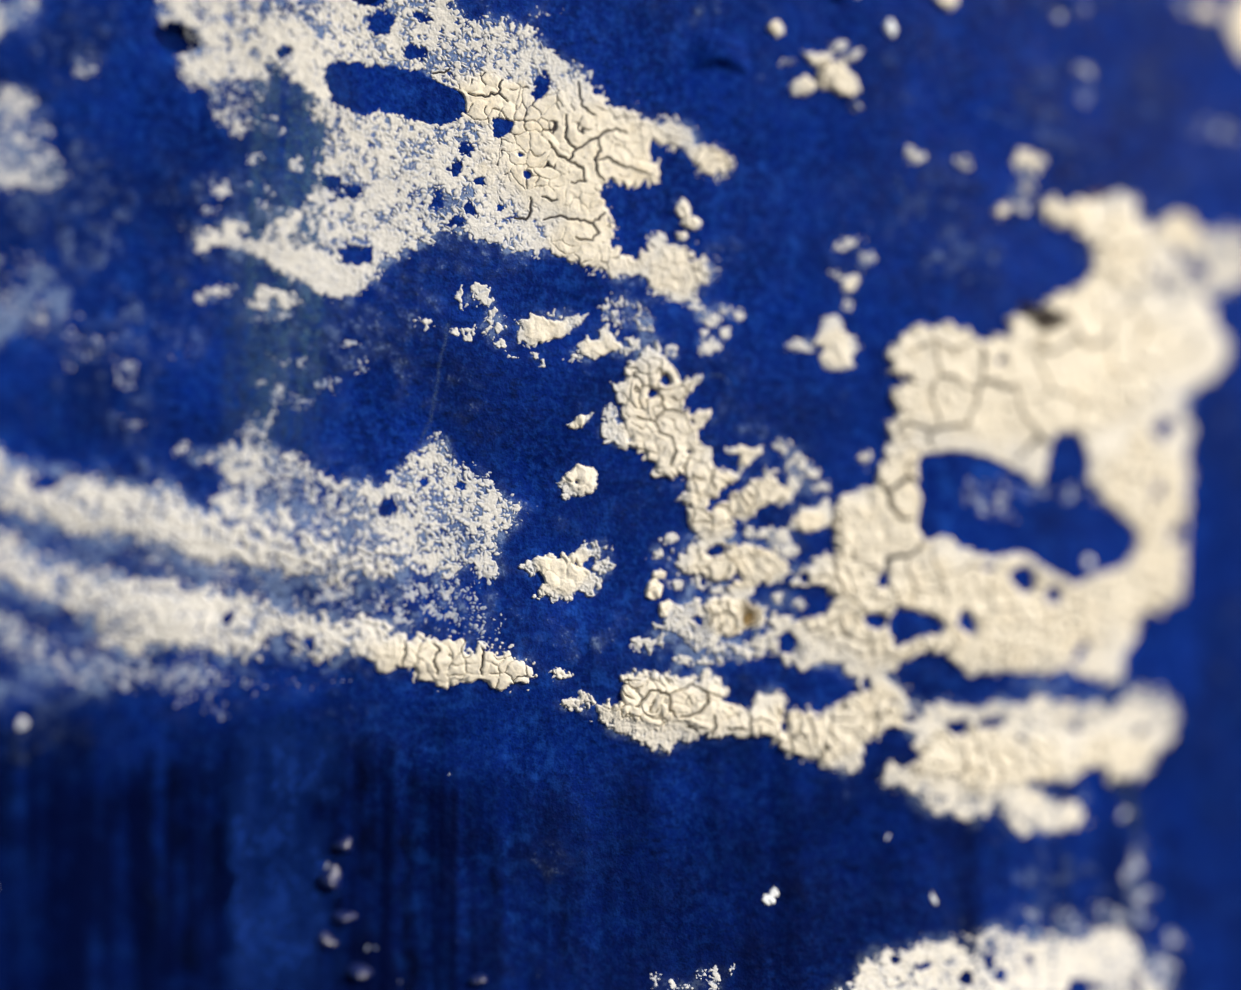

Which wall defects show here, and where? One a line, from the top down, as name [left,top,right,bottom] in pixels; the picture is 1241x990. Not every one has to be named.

crack [433,69,508,102]
crack [514,82,651,242]
peeling [0,250,138,389]
peeling [0,348,574,720]
crack [637,395,715,490]
peeling [153,0,1241,837]
crack [805,334,1050,641]
crack [707,600,736,630]
crack [635,682,773,738]
peeling [650,964,735,990]
peeling [762,887,779,906]
peeling [835,841,1186,990]